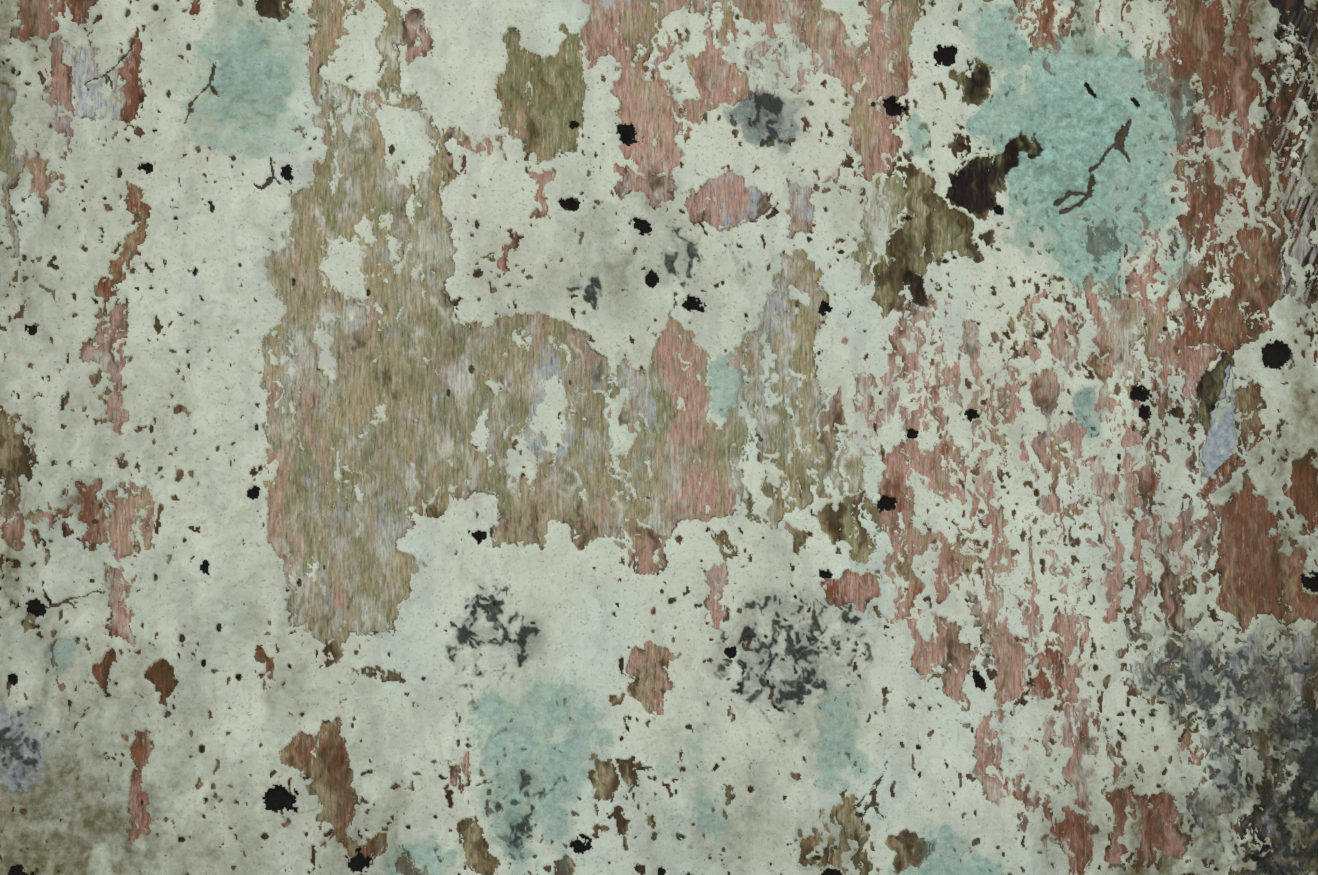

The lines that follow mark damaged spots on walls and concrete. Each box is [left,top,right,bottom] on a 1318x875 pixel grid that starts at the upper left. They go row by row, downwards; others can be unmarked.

spalling [703,658,747,722]
spalling [742,627,865,715]
spalling [866,687,893,723]
peeling [391,704,576,875]
peeling [566,750,725,875]
spalling [900,730,934,778]
leakage [1149,630,1318,875]